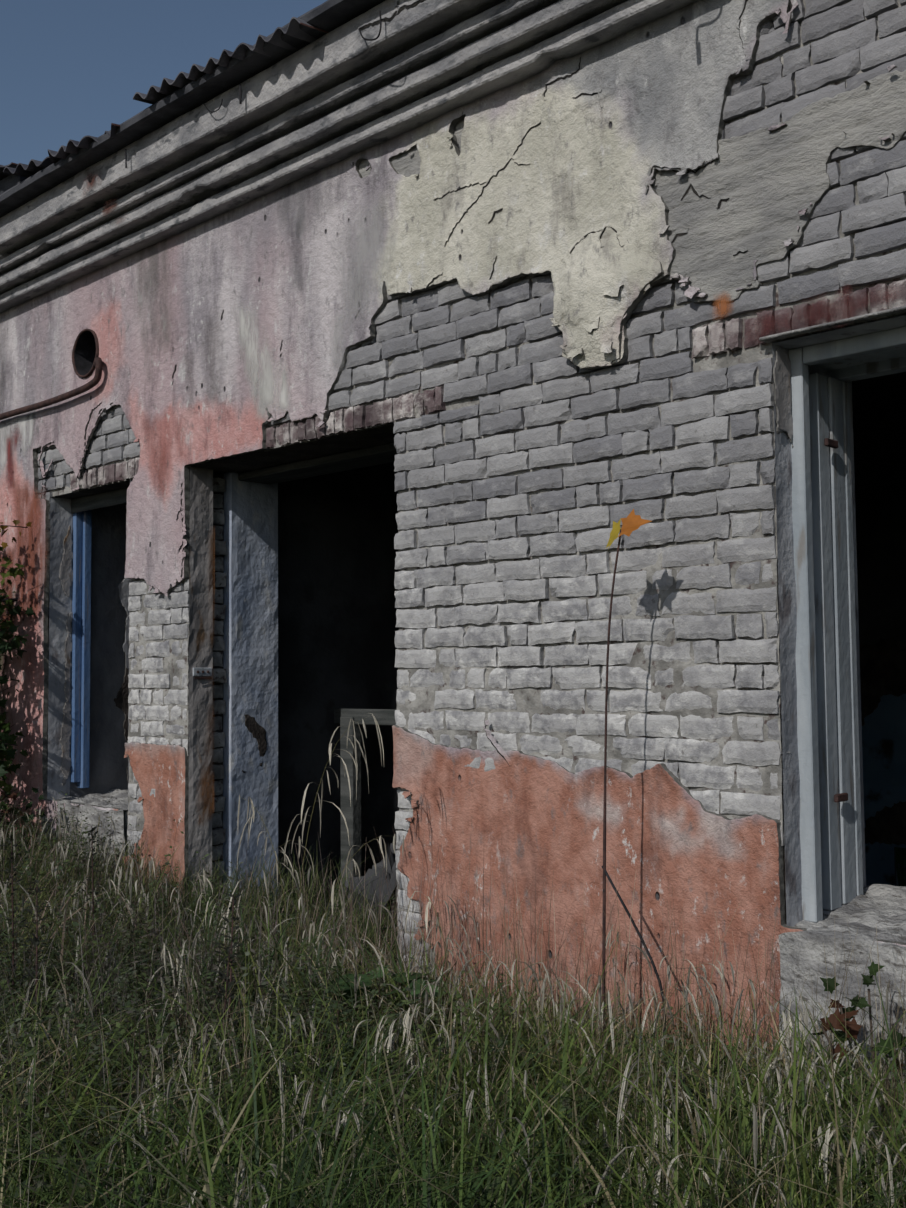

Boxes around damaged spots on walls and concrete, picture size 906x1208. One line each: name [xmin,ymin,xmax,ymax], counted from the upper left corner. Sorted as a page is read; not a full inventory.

crack [425,57,605,290]
flaking render [37,405,140,519]
flaking render [264,0,906,846]
flaking render [113,578,198,856]